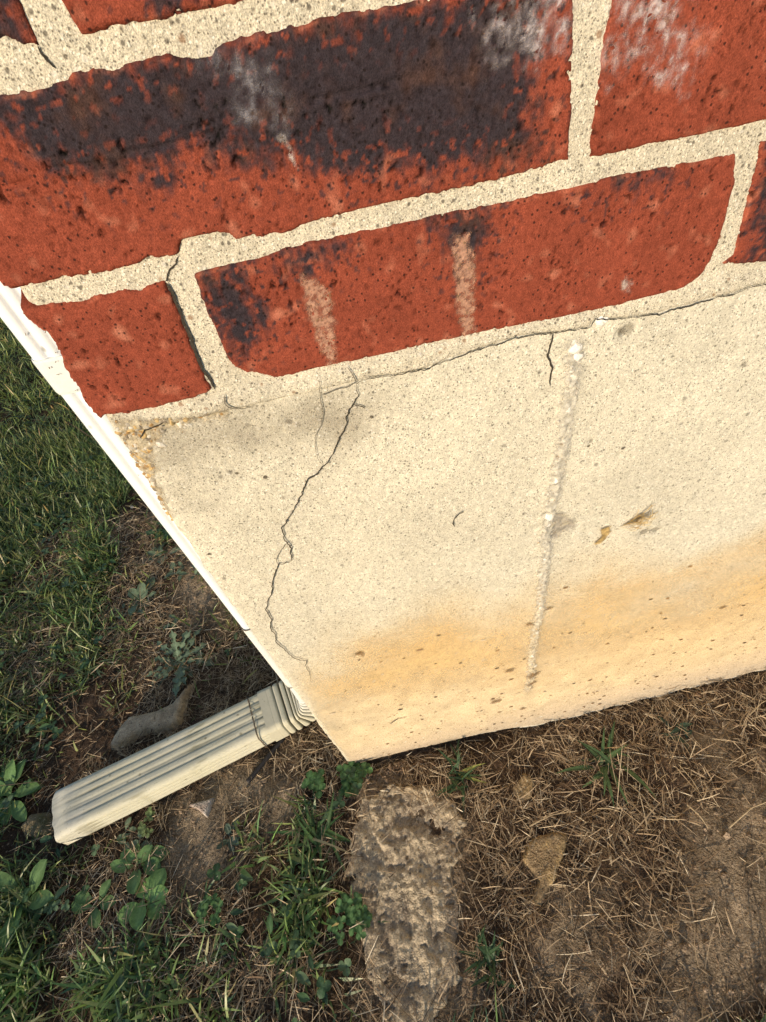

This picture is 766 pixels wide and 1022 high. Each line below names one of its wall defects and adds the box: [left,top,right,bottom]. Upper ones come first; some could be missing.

crack [265,284,766,678]